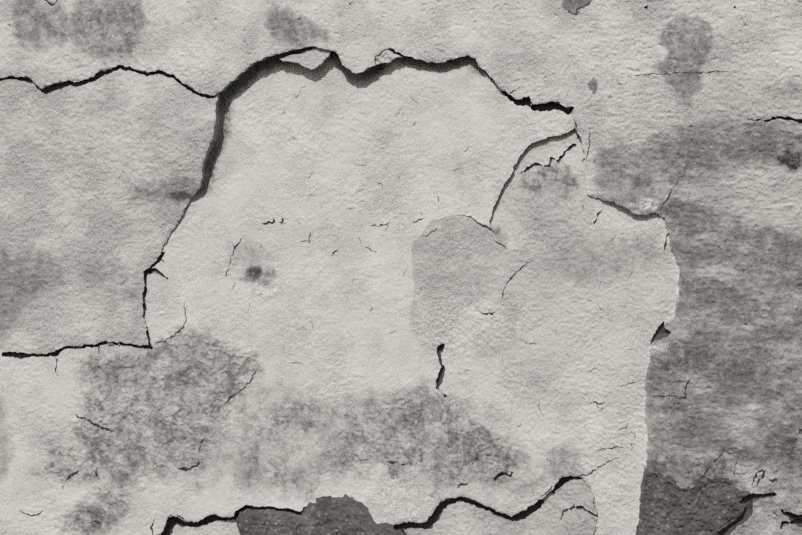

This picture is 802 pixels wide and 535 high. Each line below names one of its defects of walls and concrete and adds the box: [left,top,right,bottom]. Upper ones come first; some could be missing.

crack [0,65,215,99]
crack [478,63,590,174]
crack [2,252,187,372]
spalling [144,46,750,535]
leakage [88,344,178,417]
leakage [131,339,254,462]
crack [436,344,470,413]
leakage [82,417,145,488]
leakage [75,507,117,529]
crack [150,505,302,535]
leakage [369,464,436,522]
crack [773,509,802,529]